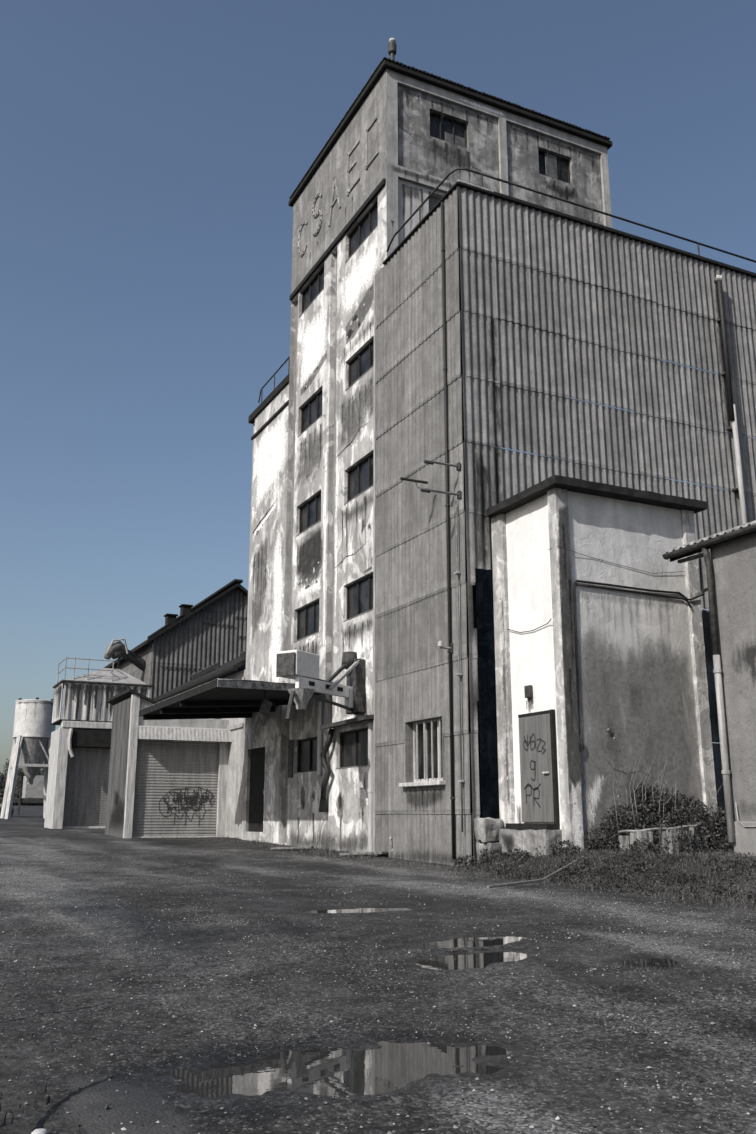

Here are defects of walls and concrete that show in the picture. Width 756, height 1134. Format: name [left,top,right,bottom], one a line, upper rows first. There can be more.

leakage [432,139,470,177]
leakage [395,167,452,236]
leakage [549,181,577,200]
leakage [476,322,501,561]
leakage [297,529,321,575]